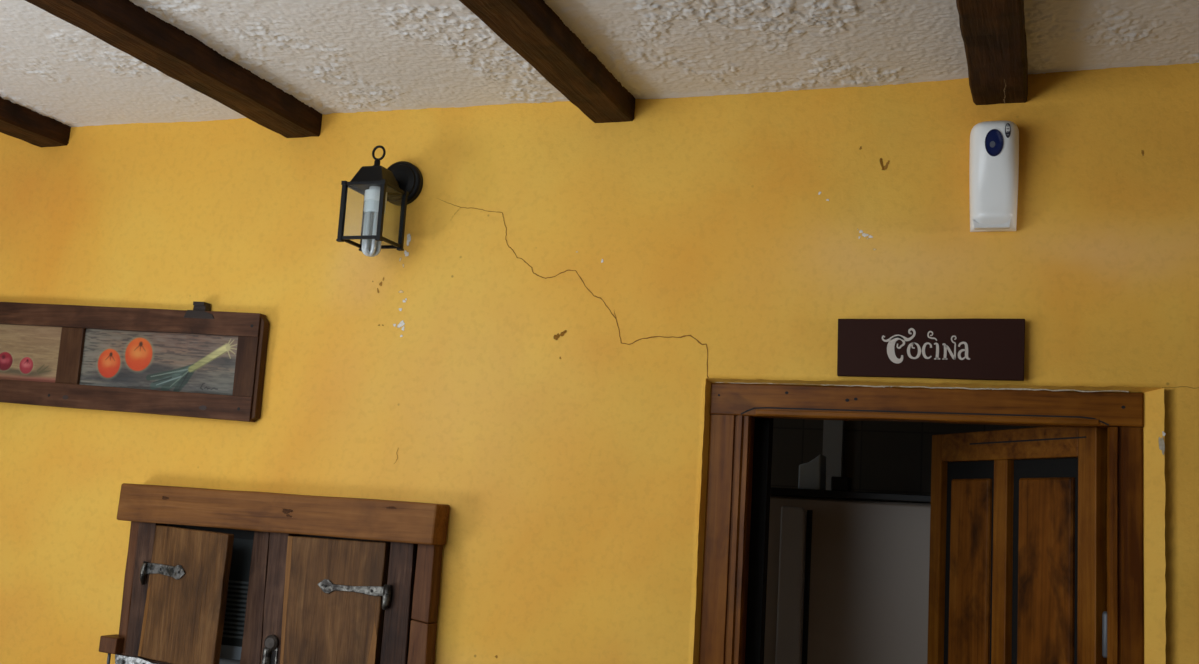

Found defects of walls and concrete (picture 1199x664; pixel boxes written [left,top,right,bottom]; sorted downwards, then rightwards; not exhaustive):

crack [437,198,709,378]